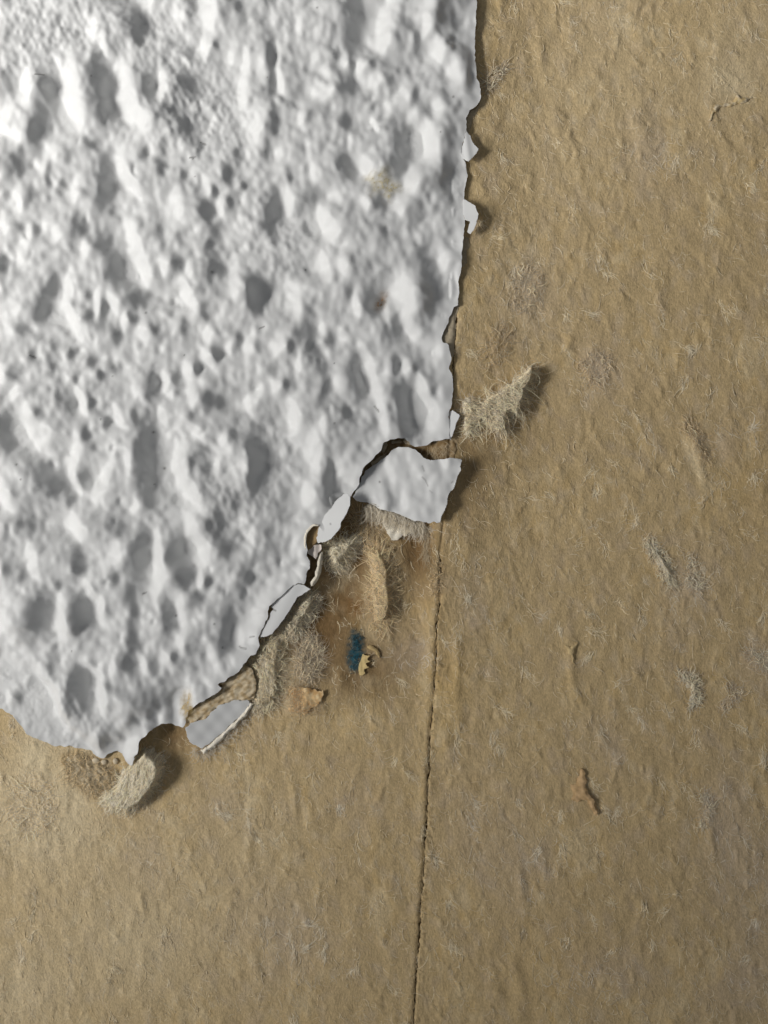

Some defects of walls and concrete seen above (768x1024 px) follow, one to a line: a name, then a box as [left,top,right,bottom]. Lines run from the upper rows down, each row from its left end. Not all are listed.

peeling [461,131,479,162]
peeling [463,199,478,234]
peeling [449,410,460,440]
peeling [316,439,462,568]
peeling [260,584,310,637]
peeling [358,645,380,676]
peeling [185,664,267,766]
peeling [280,669,331,720]
crack [407,557,445,1024]